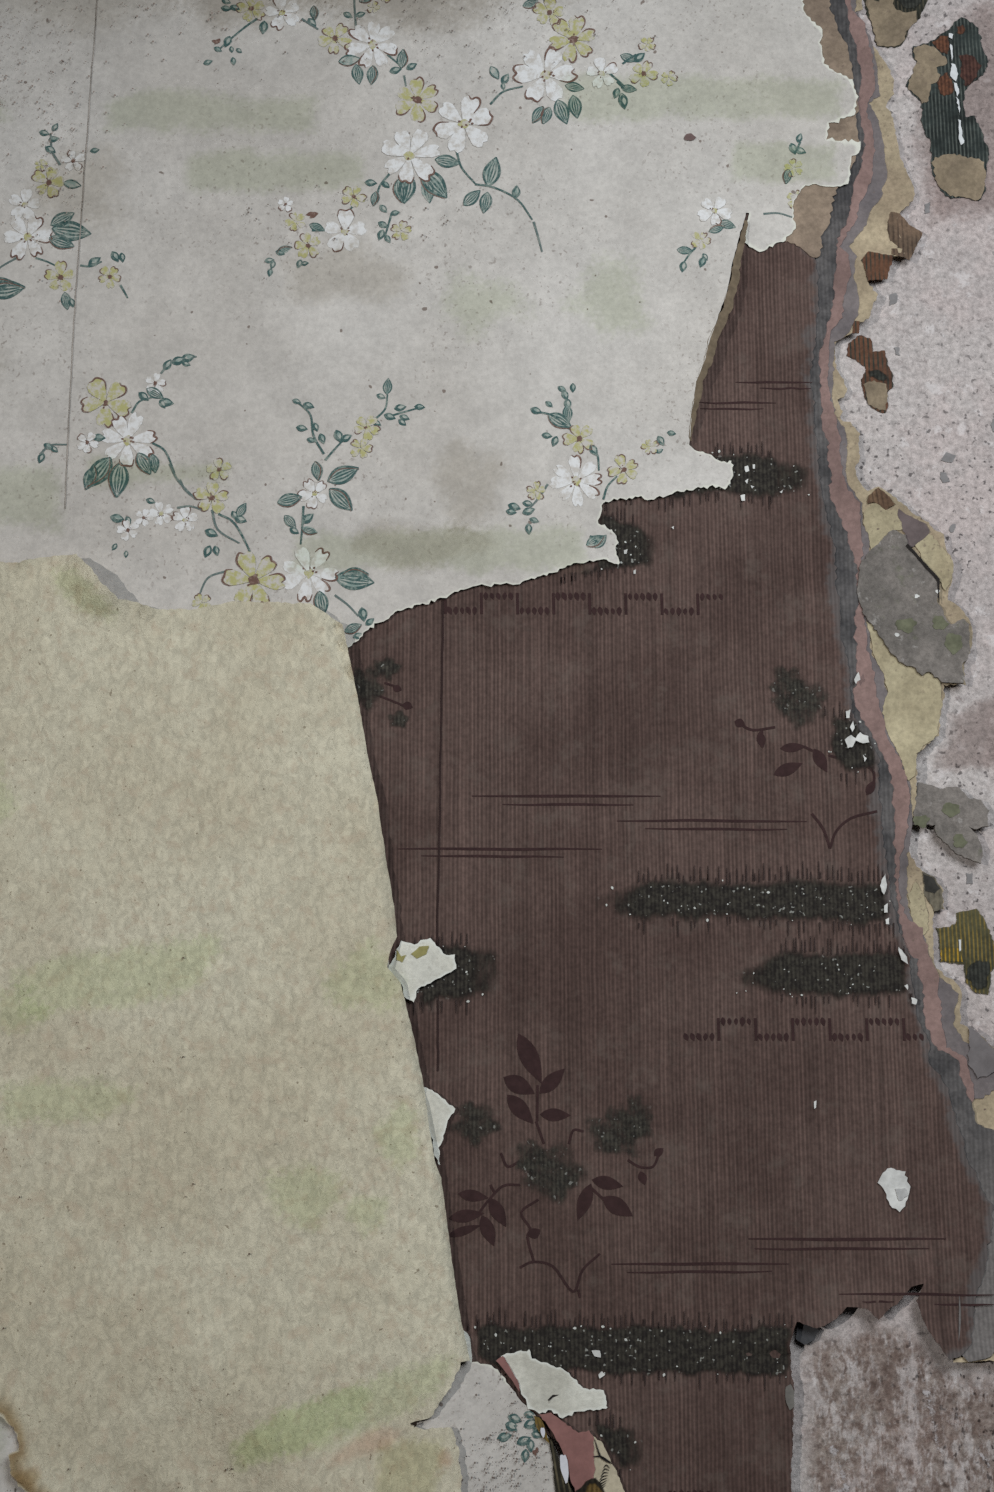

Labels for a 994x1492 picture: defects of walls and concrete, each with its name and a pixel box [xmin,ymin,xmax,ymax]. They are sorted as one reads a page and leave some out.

flaking render [857,487,971,684]
flaking render [913,782,990,864]
water stain [606,861,912,1014]
peeling [967,1027,994,1078]
peeling [496,1356,520,1392]
water stain [448,1306,792,1492]